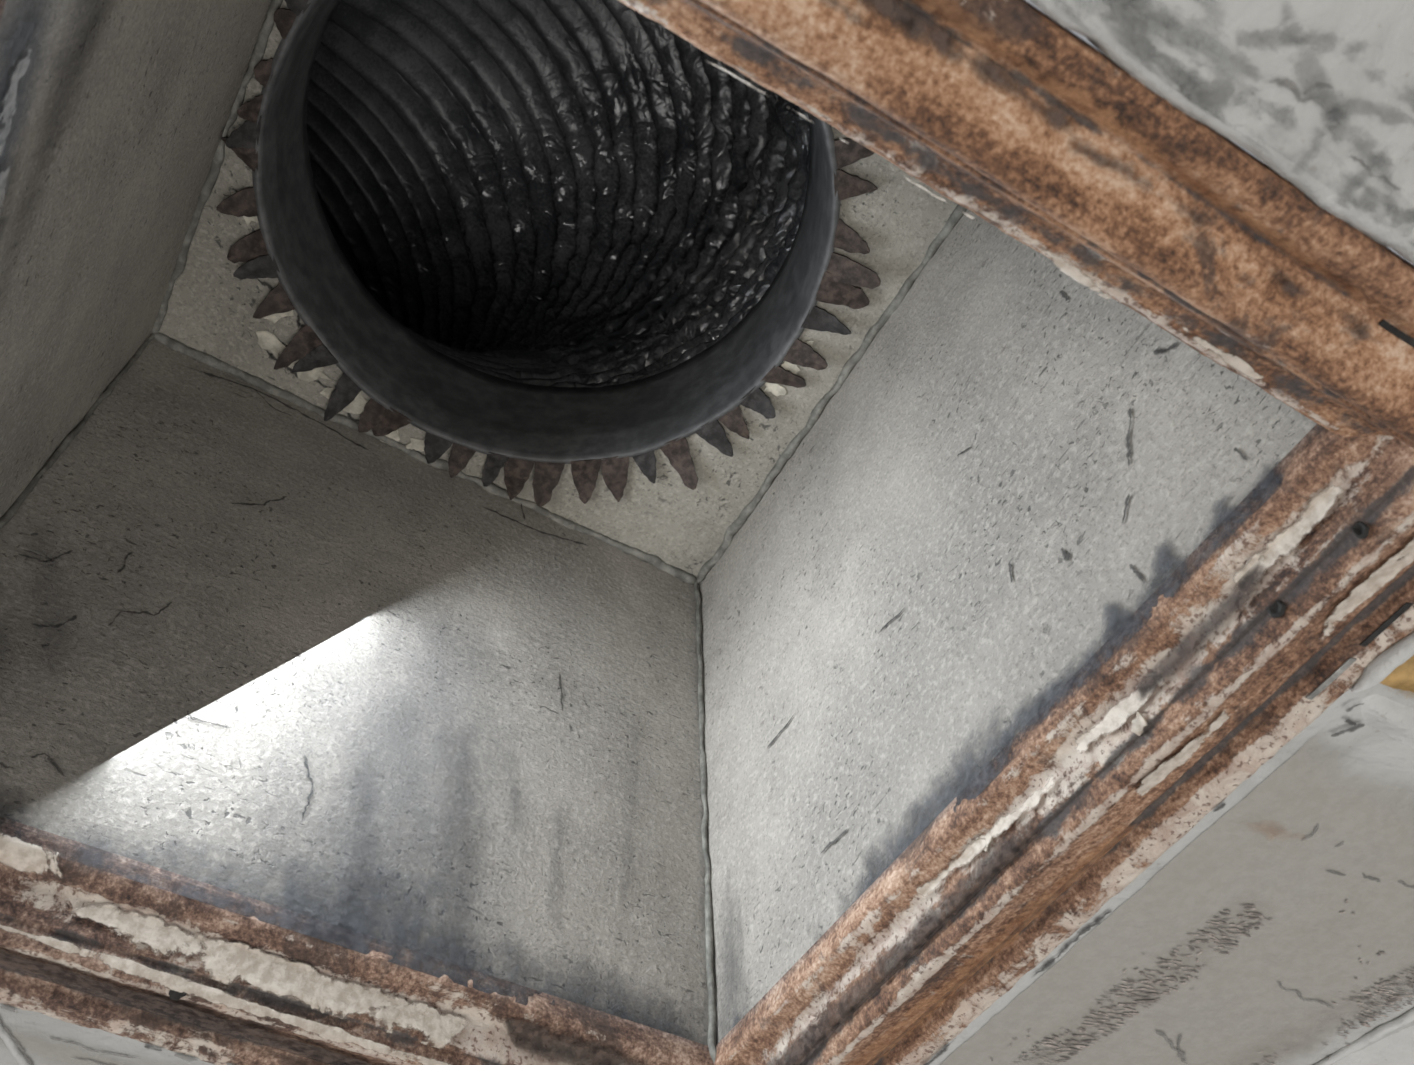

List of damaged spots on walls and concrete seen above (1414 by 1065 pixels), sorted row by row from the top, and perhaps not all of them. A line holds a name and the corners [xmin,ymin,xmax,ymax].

rust [831,0,957,58]
rust [973,59,1025,92]
rust [1078,147,1133,174]
water stain [853,469,1279,903]
rust [1136,566,1263,697]
peeling [1233,485,1342,583]
peeling [1322,540,1414,639]
peeling [0,834,62,877]
peeling [916,776,1055,897]
peeling [0,904,467,1065]
water stain [125,855,686,1038]
rust [766,823,1042,1065]